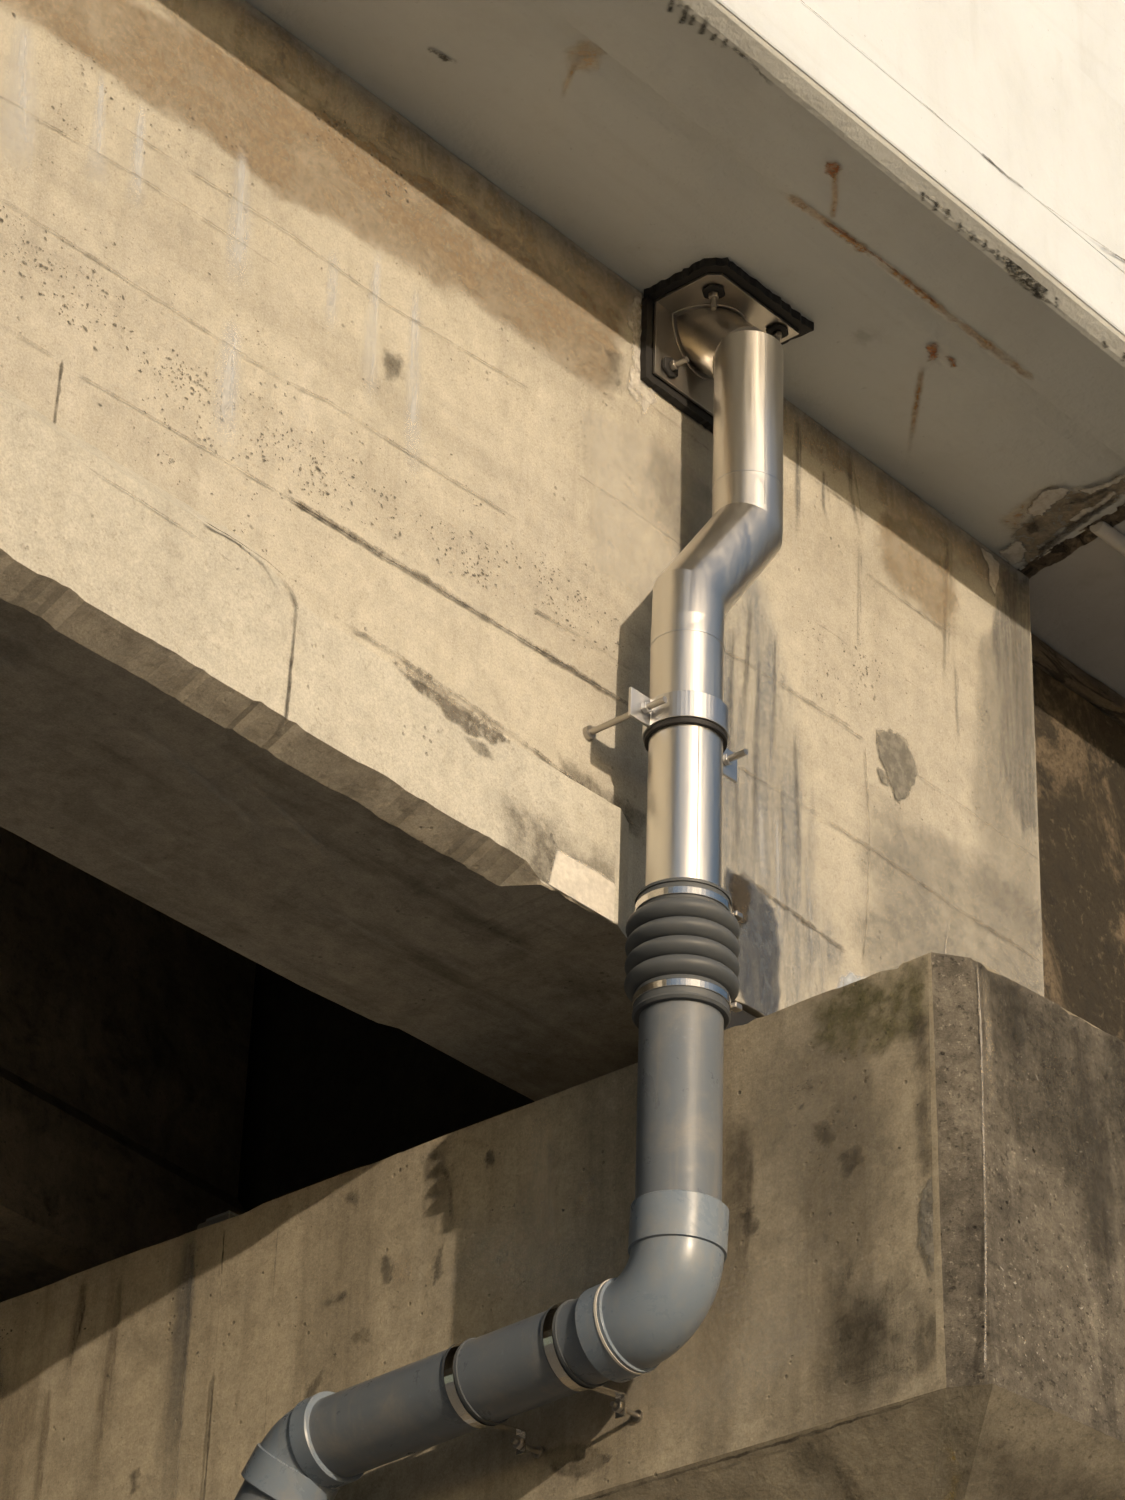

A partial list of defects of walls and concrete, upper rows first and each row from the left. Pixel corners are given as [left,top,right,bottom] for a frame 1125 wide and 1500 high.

leakage [25,0,655,412]
corrosion [826,163,840,182]
corrosion [823,202,941,309]
corrosion [926,344,956,367]
peeling [980,475,1125,594]
leakage [723,767,811,1016]